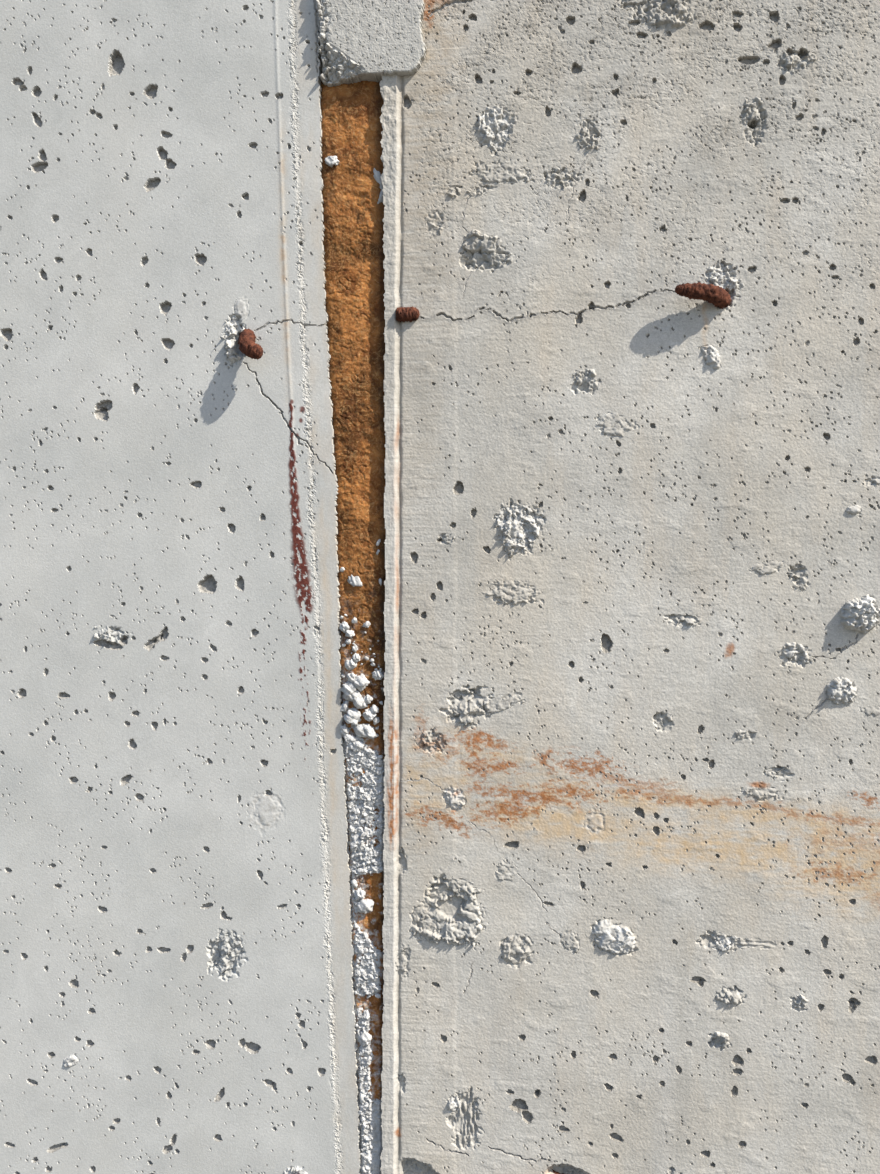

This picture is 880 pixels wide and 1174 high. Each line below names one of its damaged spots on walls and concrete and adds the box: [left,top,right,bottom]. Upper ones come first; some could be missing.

spalling [318,36,367,87]
crack [462,196,471,234]
corrosion [238,328,263,360]
crack [256,320,326,331]
corrosion [396,306,420,322]
crack [418,269,670,322]
corrosion [675,282,731,362]
crack [244,363,333,474]
corrosion [277,114,317,787]
corrosion [384,414,880,934]
spalling [400,1158,440,1174]
spalling [544,1162,589,1174]